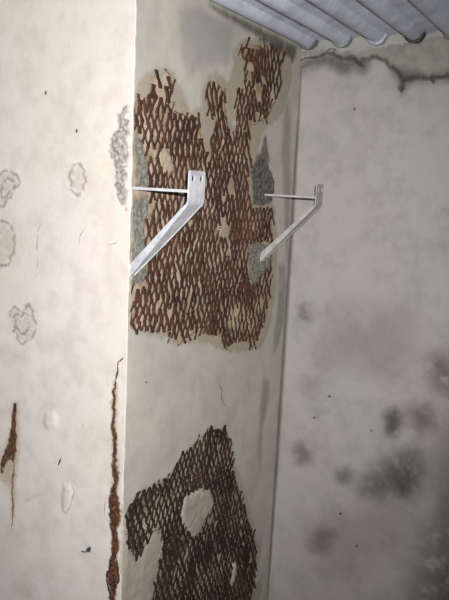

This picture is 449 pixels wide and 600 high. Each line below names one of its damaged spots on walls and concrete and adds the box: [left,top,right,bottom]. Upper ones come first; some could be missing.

spalling [111,37,286,351]
corrosion [0,403,17,531]
spalling [125,425,258,600]